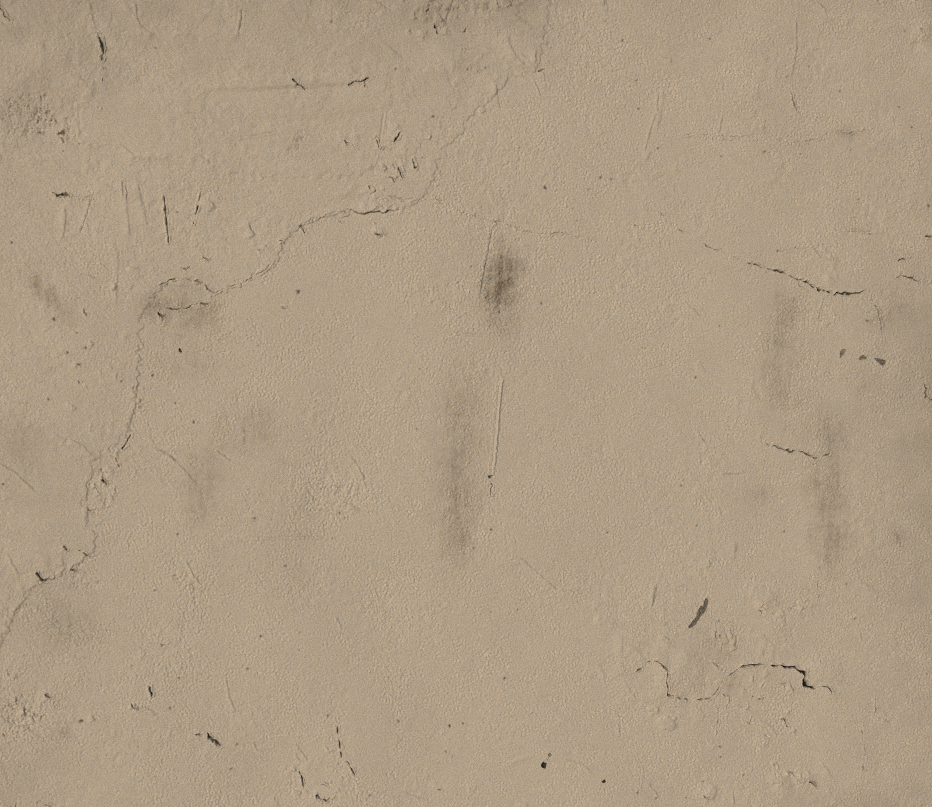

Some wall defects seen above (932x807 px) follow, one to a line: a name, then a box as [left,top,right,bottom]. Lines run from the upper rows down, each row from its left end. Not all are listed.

crack [645,200,886,342]
crack [756,433,836,463]
crack [634,658,835,740]